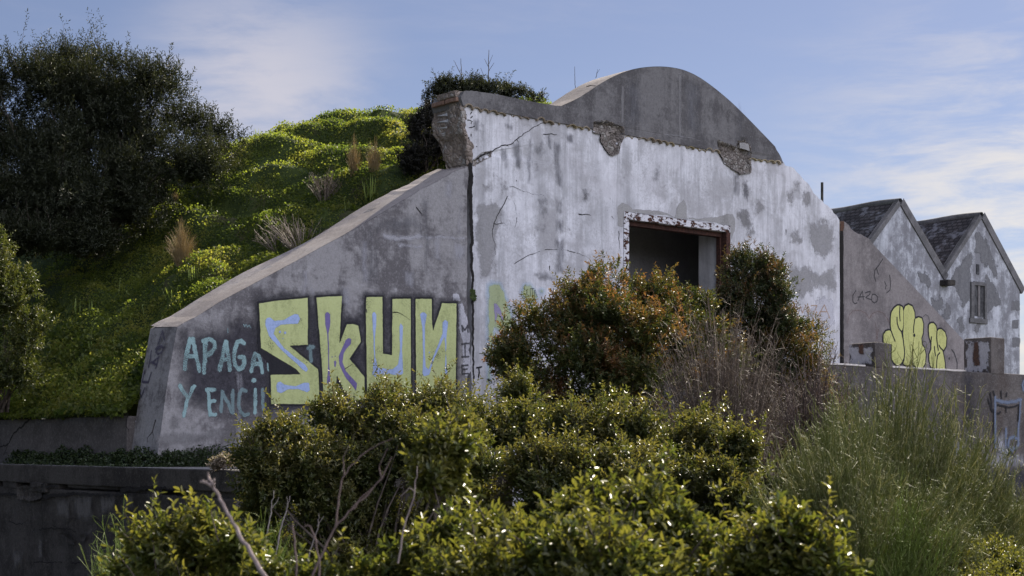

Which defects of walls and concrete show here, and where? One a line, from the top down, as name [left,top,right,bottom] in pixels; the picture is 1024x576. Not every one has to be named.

spalling [432,102,492,169]
spalling [592,120,625,156]
spalling [717,140,752,189]
peeling [617,200,764,239]
crack [468,123,584,383]